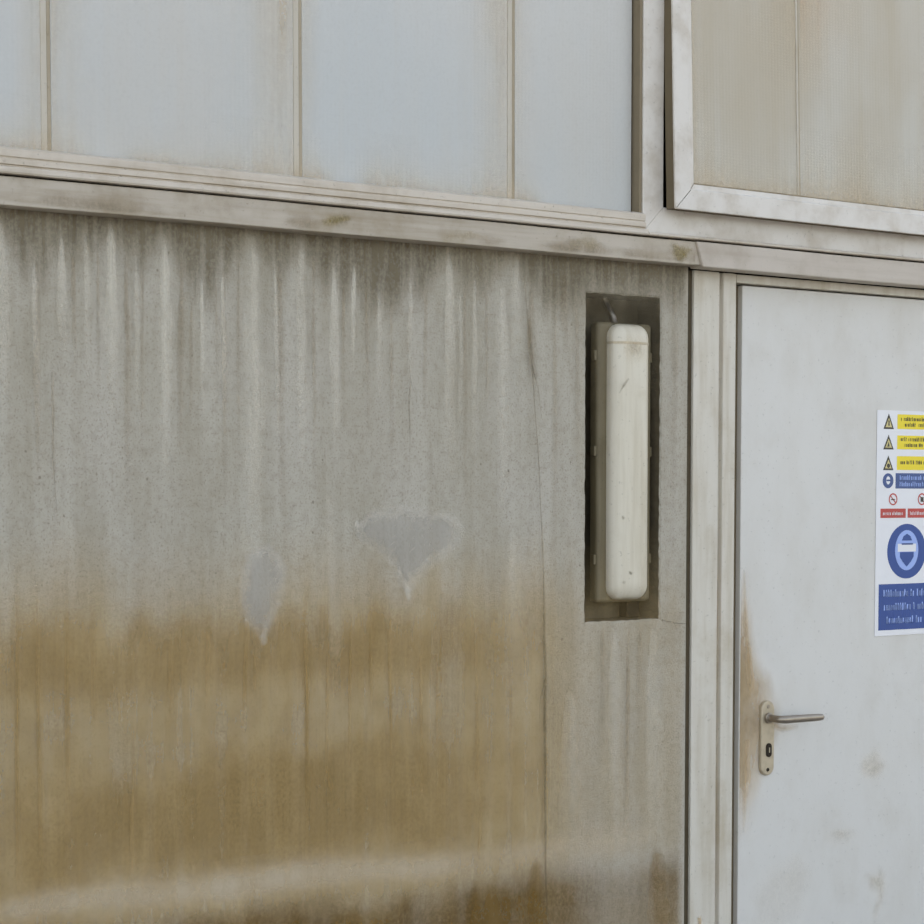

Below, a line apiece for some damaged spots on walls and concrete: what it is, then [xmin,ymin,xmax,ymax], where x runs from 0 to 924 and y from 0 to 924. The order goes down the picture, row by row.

water stain [2,208,245,286]
water stain [256,230,683,302]
corrosion [739,634,760,787]